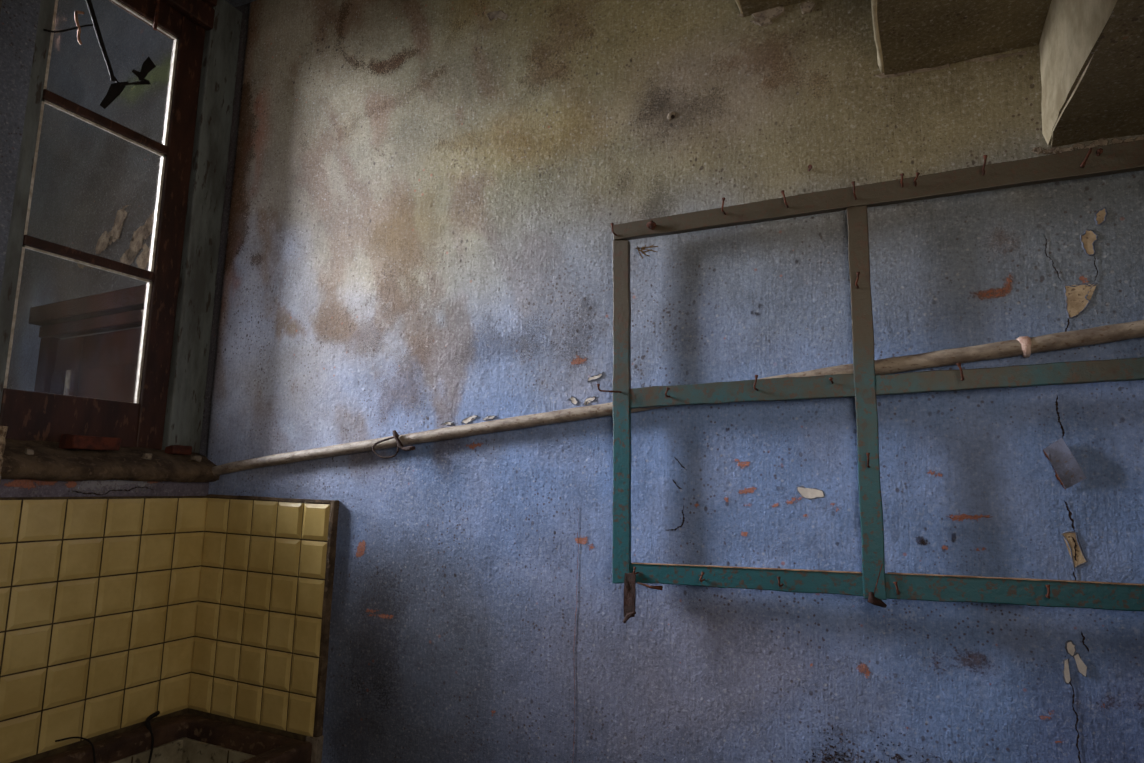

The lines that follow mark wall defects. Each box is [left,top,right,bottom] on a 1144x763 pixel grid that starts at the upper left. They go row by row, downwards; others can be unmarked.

water stain [336,2,416,74]
peeling [772,486,839,517]
crack [1043,396,1088,580]
crack [1062,631,1089,763]
water stain [770,727,976,763]